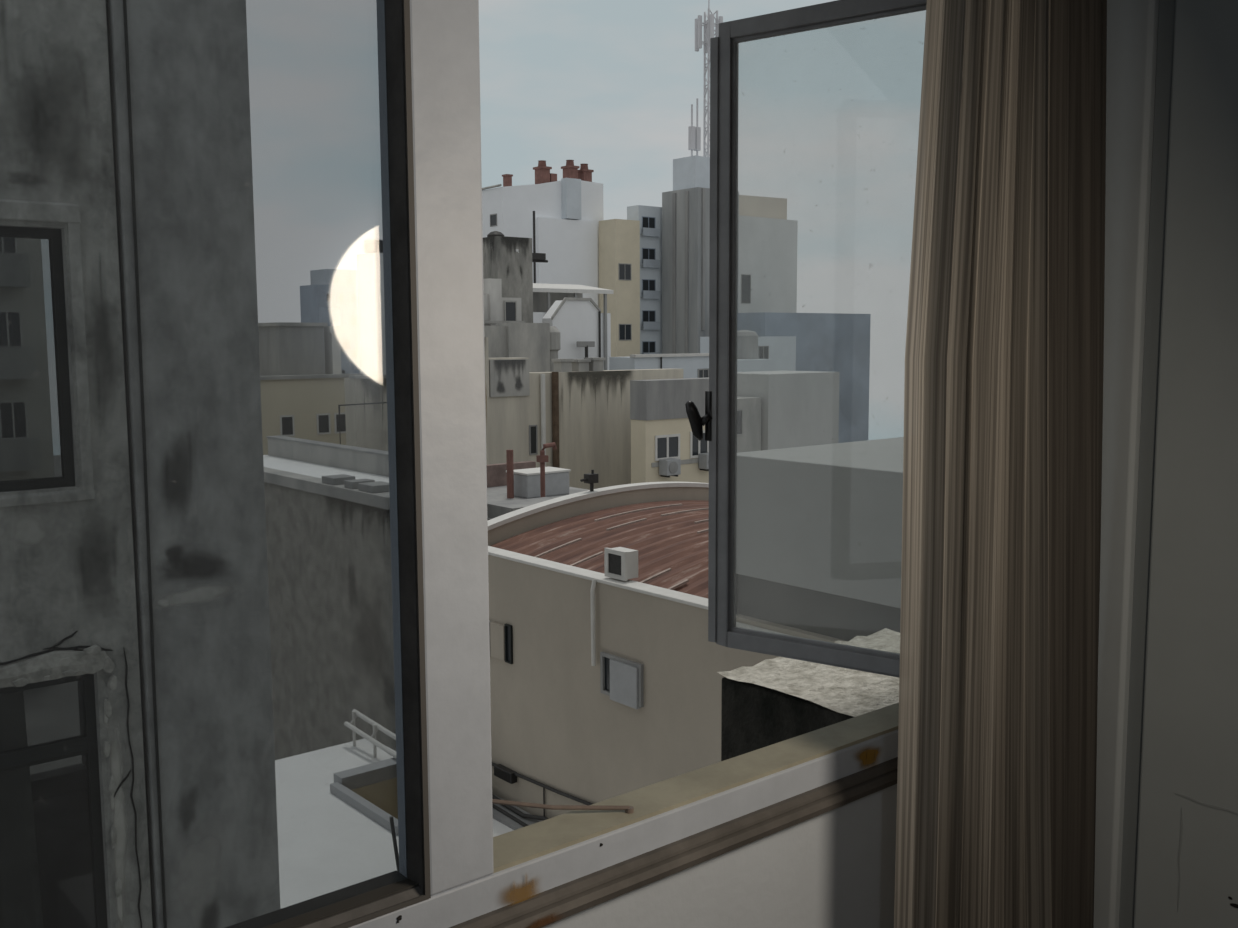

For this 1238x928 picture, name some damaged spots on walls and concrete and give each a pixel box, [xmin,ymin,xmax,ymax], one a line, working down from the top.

leakage [494,360,525,392]
leakage [568,370,631,386]
crack [0,631,142,928]
rust [506,877,535,905]